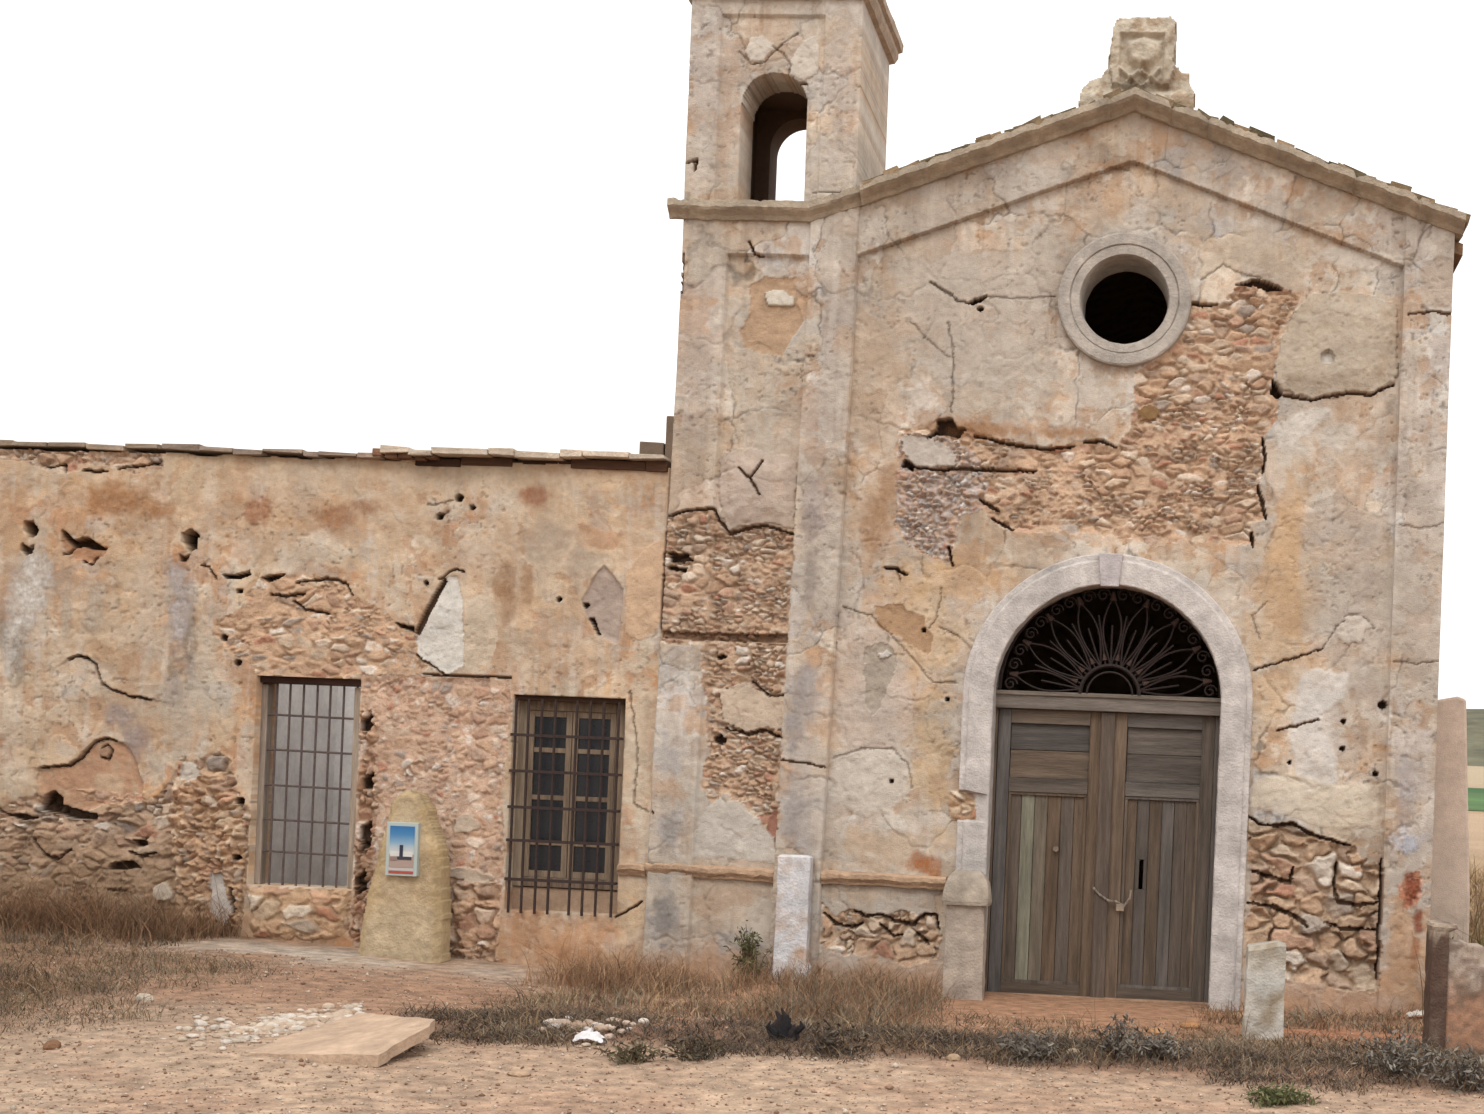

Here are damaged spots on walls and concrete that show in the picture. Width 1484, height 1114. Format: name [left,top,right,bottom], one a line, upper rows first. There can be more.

crack [910,283,1056,415]
spalling [894,280,1304,567]
spalling [62,534,108,567]
crack [73,656,153,701]
spalling [0,569,512,962]
spalling [582,508,795,854]
crack [1277,719,1320,732]
crack [1252,602,1346,672]
spalling [820,903,943,968]
spalling [1244,816,1424,994]